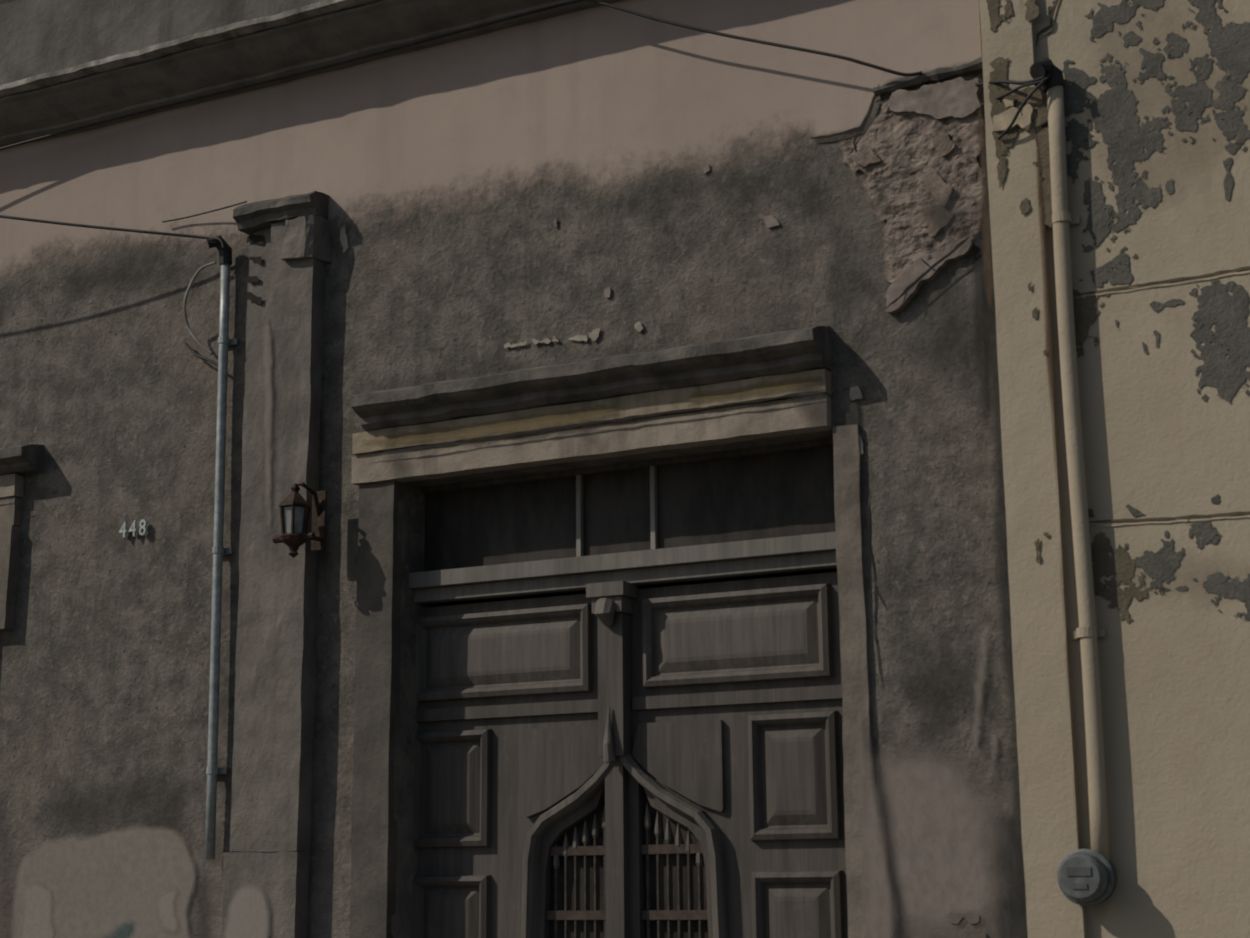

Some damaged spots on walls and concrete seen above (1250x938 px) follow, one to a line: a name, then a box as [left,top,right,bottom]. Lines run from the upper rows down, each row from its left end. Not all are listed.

peeling [986,0,1039,31]
crack [1036,0,1060,52]
flaking render [840,57,1052,314]
peeling [1063,0,1250,357]
flaking render [504,328,601,349]
peeling [1149,279,1250,404]
leakage [351,326,832,460]
leakage [0,444,44,475]
peeling [1126,504,1145,517]
peeling [1034,533,1049,563]
peeling [1091,520,1250,624]